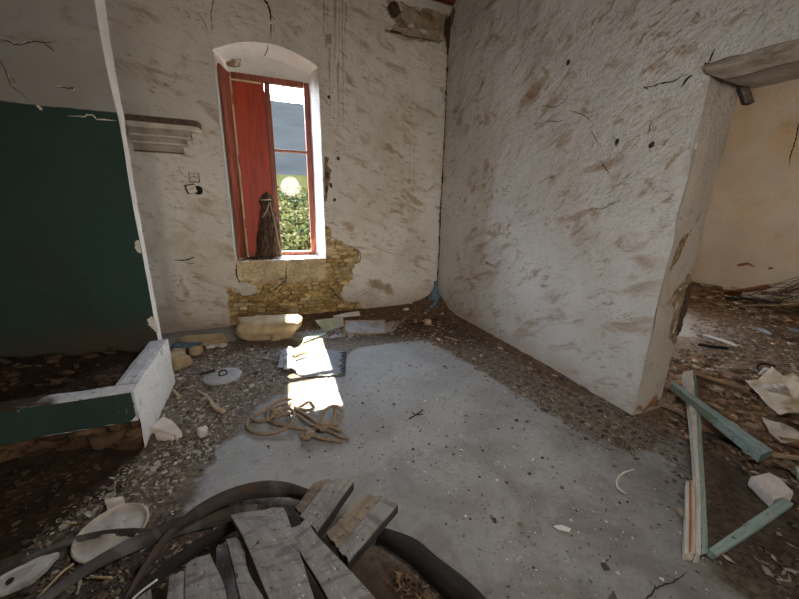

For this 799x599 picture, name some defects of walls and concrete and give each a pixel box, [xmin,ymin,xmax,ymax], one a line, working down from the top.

crack [264,0,275,56]
spalling [384,0,455,55]
crack [0,39,54,102]
crack [72,113,115,121]
spalling [226,226,363,326]
spalling [669,274,693,345]
crack [646,571,688,599]